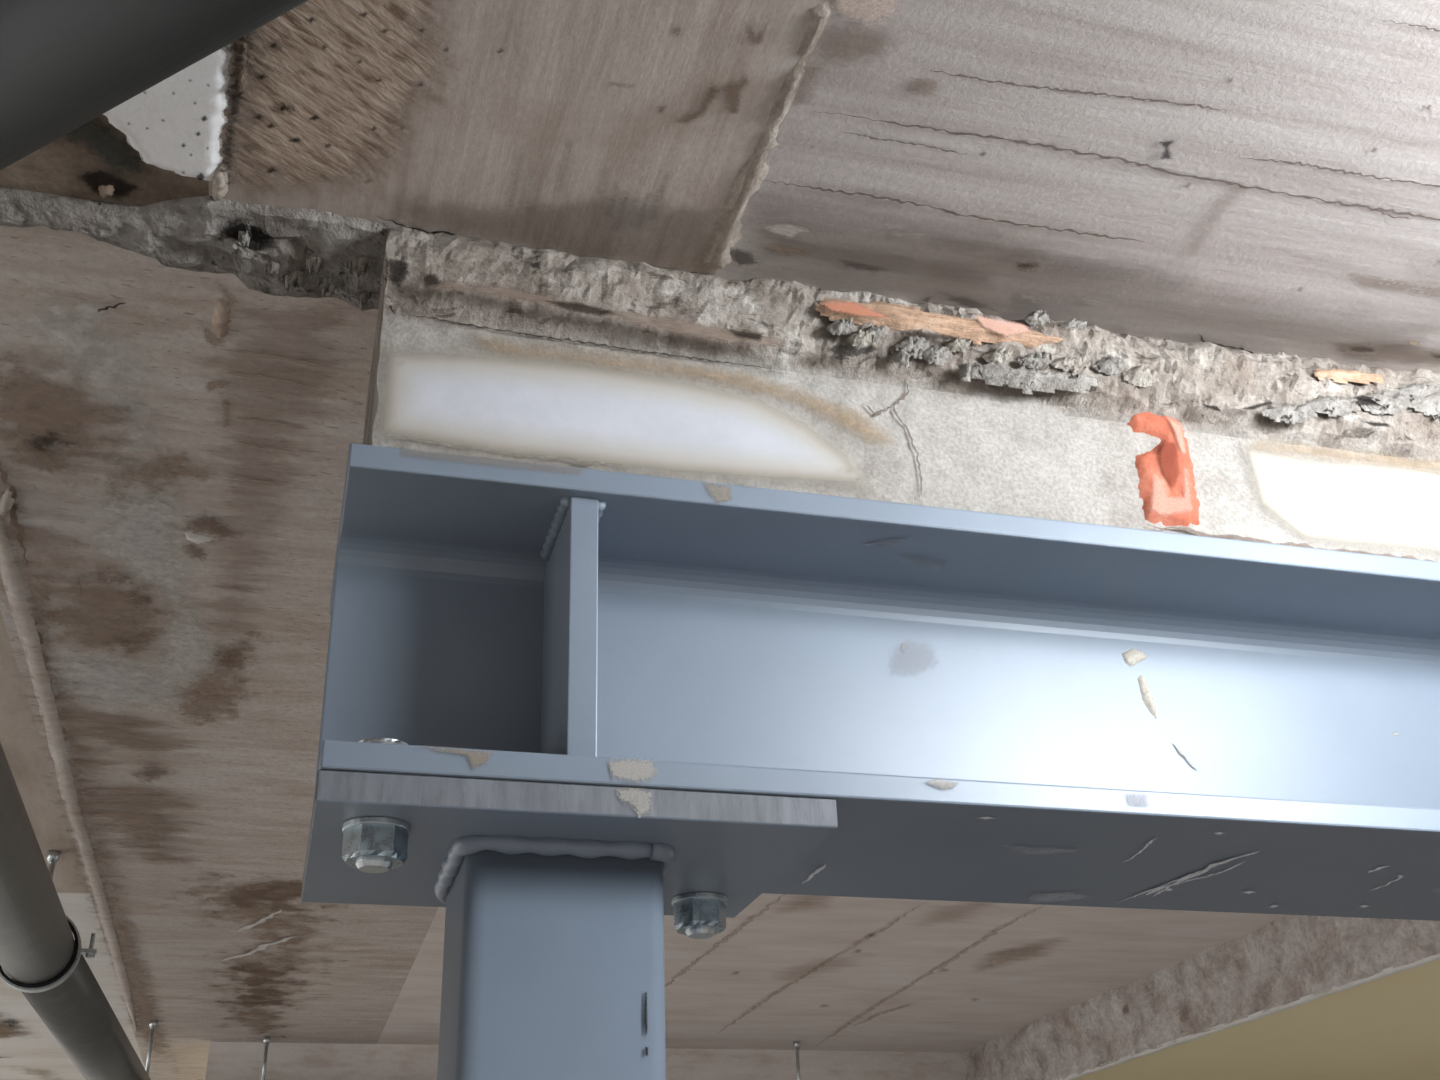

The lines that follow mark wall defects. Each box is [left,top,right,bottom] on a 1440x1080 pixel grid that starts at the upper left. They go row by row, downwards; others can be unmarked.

crack [1380,19,1440,31]
crack [916,67,1229,111]
peeling [98,185,115,198]
peeling [238,222,251,250]
peeling [730,225,810,265]
crack [765,180,1160,245]
crack [801,108,1440,220]
spalling [432,281,785,346]
flaking render [815,294,1160,387]
peeling [1262,383,1440,424]
crack [866,380,922,498]
leakage [51,495,212,705]